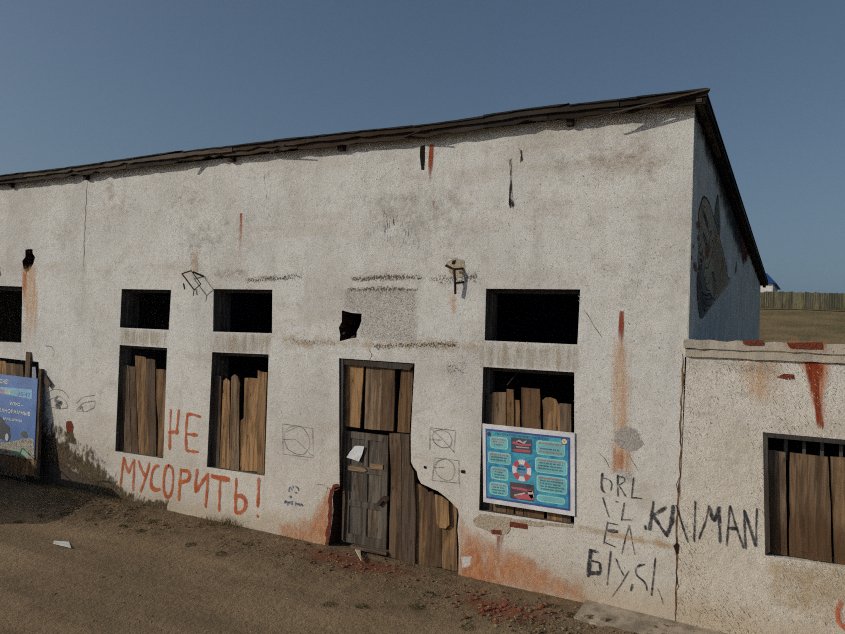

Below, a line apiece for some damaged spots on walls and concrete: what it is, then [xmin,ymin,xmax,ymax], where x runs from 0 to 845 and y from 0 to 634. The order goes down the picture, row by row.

corrosion [805,362,825,428]
corrosion [286,500,328,545]
peeling [473,514,573,536]
corrosion [465,537,547,588]